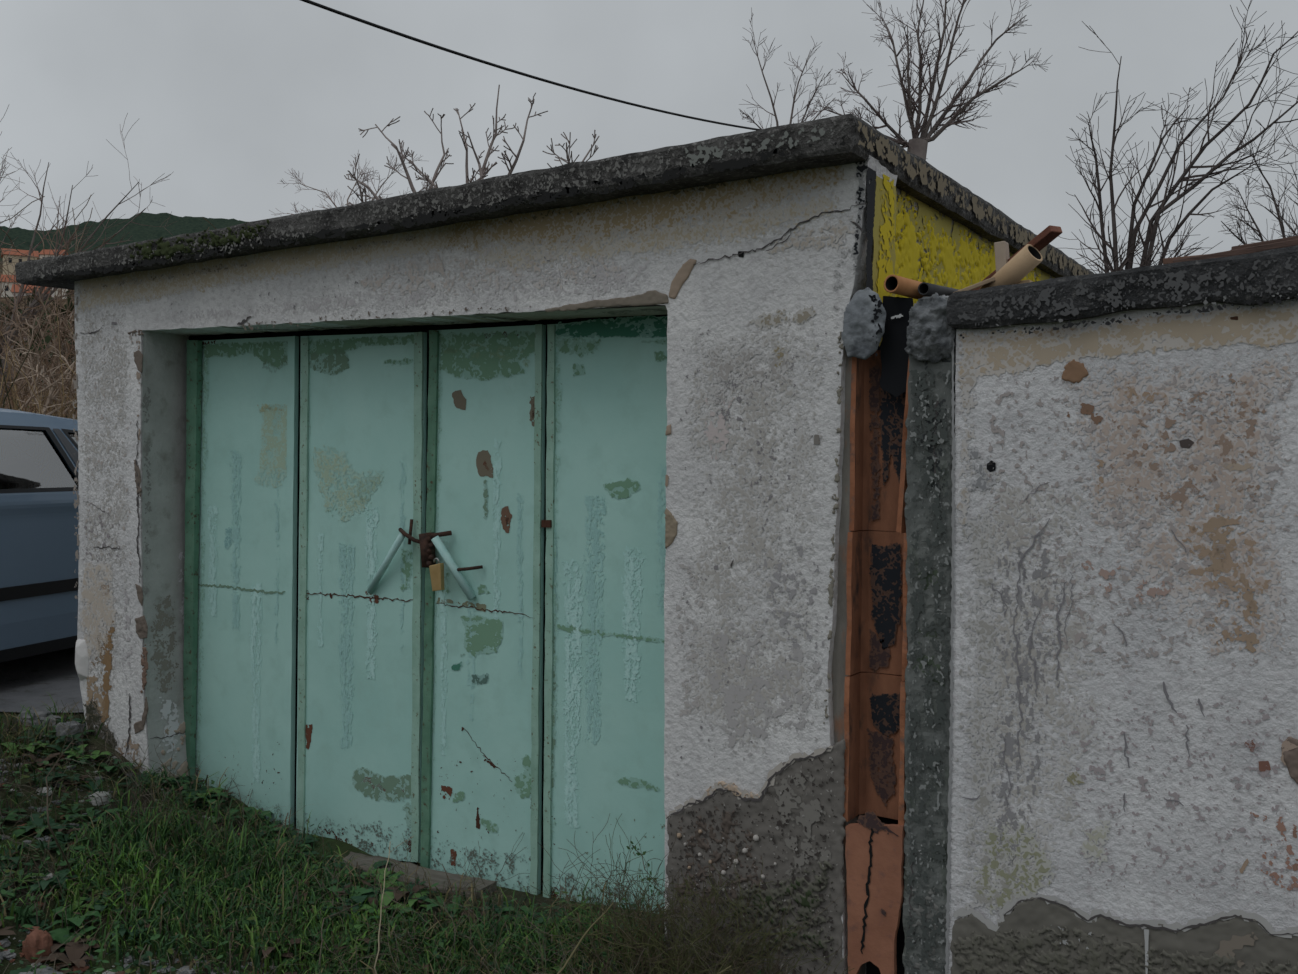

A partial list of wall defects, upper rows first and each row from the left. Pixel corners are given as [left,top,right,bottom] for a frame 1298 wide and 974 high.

crack [693,203,867,265]
spalling [424,259,696,315]
peeling [452,390,466,410]
peeling [476,450,493,478]
spalling [101,584,149,770]
crack [962,482,1073,808]
spalling [950,359,1298,974]
rust [305,724,313,749]
spalling [664,739,846,974]